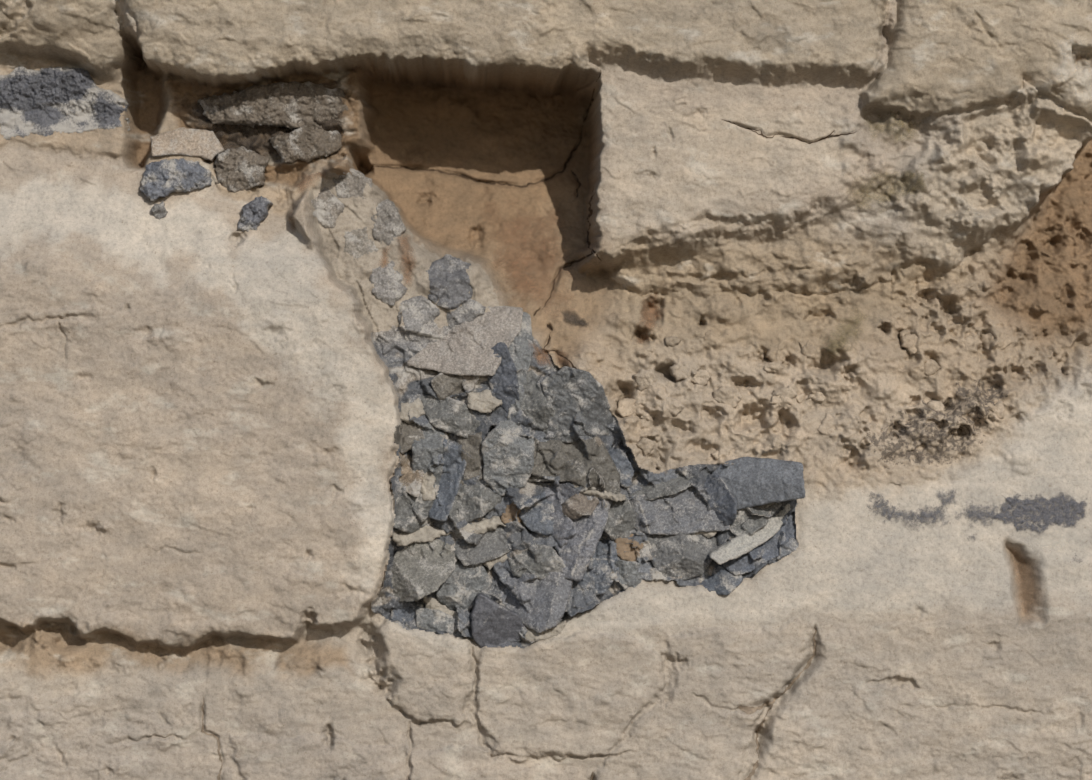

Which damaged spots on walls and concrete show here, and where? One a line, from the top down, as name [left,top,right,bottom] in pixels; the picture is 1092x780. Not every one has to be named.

crack [722,119,862,144]
spalling [311,169,406,260]
crack [364,70,601,369]
spalling [369,139,1092,648]
crack [201,697,223,780]
crack [737,625,817,780]